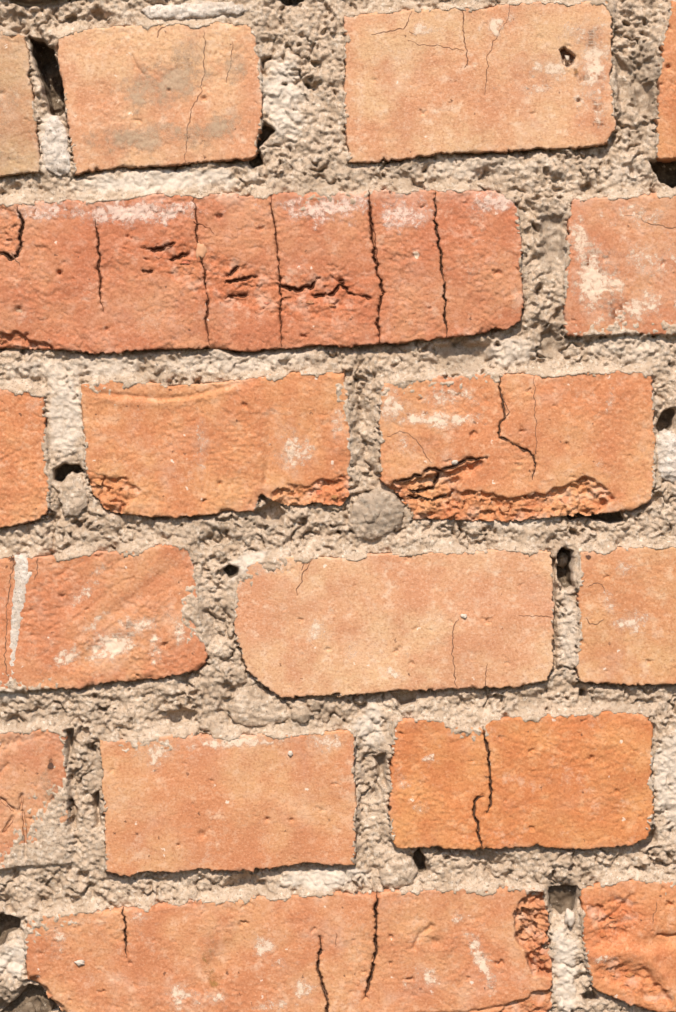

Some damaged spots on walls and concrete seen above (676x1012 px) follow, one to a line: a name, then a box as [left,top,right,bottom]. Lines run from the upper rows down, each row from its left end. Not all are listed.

spalling [0,208,21,253]
crack [368,190,384,343]
crack [434,192,448,339]
crack [385,376,538,501]
spalling [86,472,141,514]
spalling [271,476,351,506]
spalling [390,461,614,522]
crack [473,729,492,848]
crack [317,933,337,1012]
crack [365,890,378,996]
spalling [500,989,552,1012]
spalling [513,892,552,977]